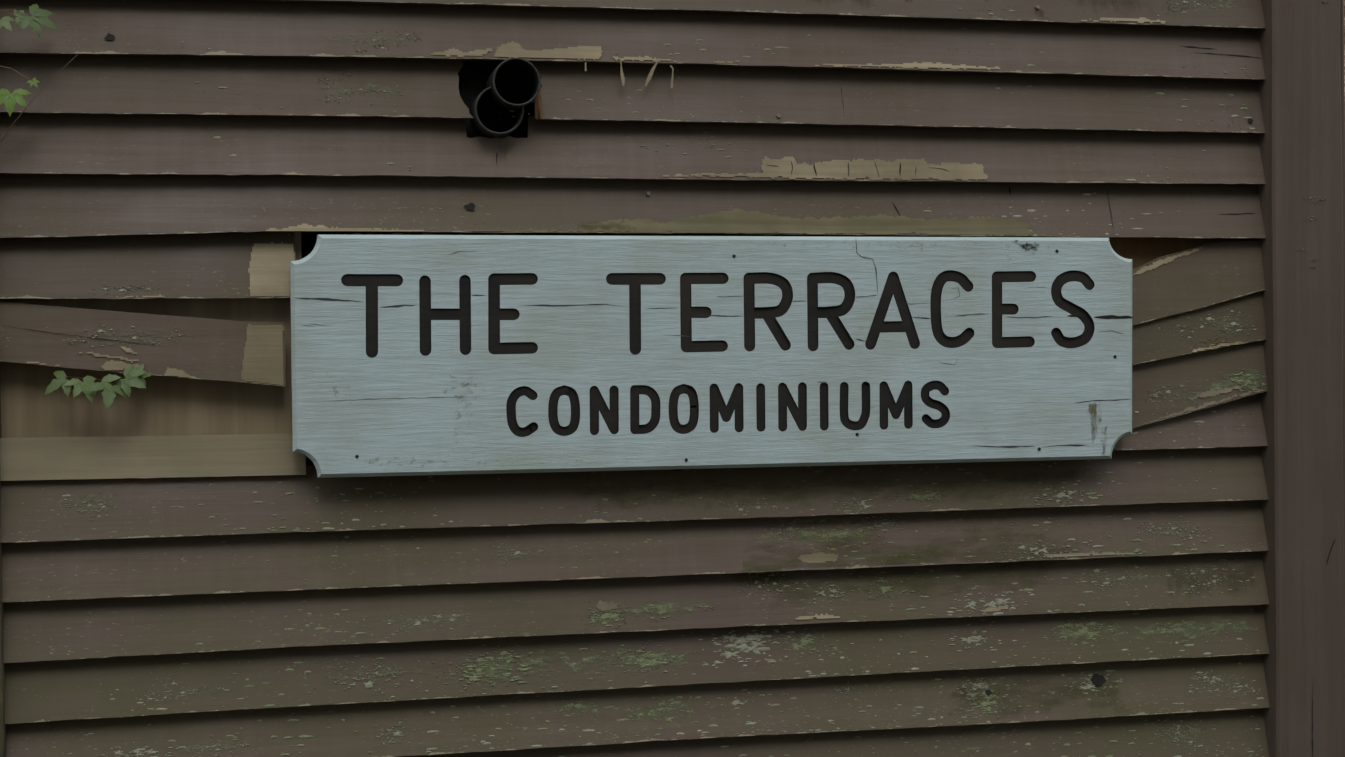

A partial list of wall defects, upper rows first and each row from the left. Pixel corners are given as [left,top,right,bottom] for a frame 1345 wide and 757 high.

spalling [431,41,677,138]
peeling [663,156,988,181]
peeling [78,347,140,372]
peeling [241,324,284,386]
peeling [163,367,190,380]